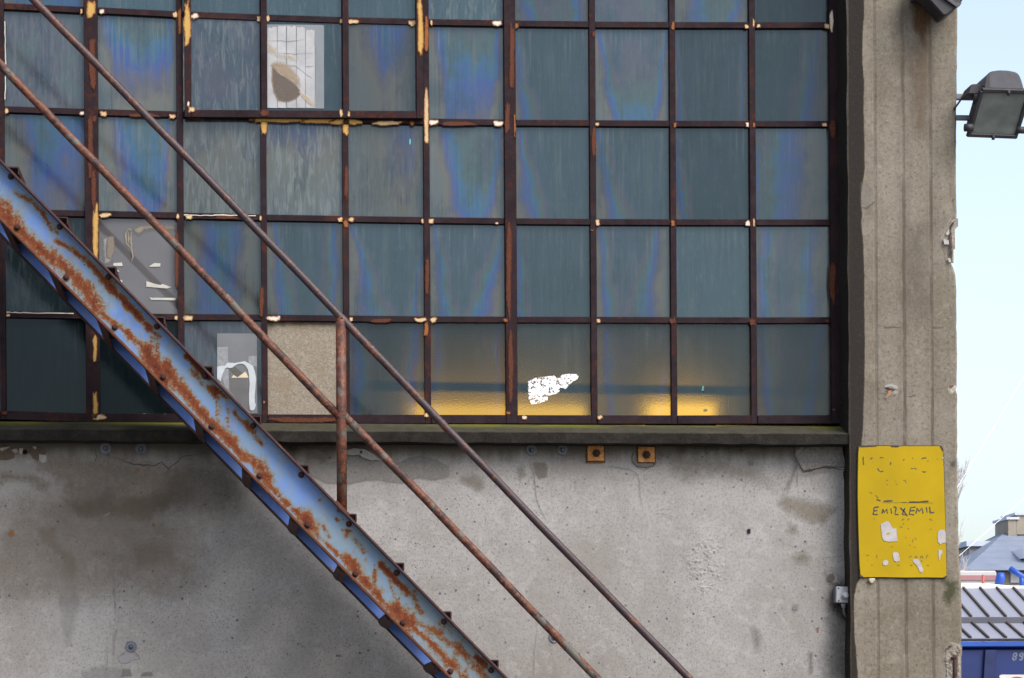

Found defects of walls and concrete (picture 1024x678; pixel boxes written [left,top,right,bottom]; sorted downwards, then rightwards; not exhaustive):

peeling [173,0,199,47]
corrosion [88,38,96,91]
corrosion [509,22,519,88]
peeling [254,109,402,136]
corrosion [504,102,516,137]
corrosion [87,115,97,213]
spalling [941,218,958,263]
corrosion [829,261,837,306]
corrosion [503,221,514,415]
peeling [0,446,47,463]